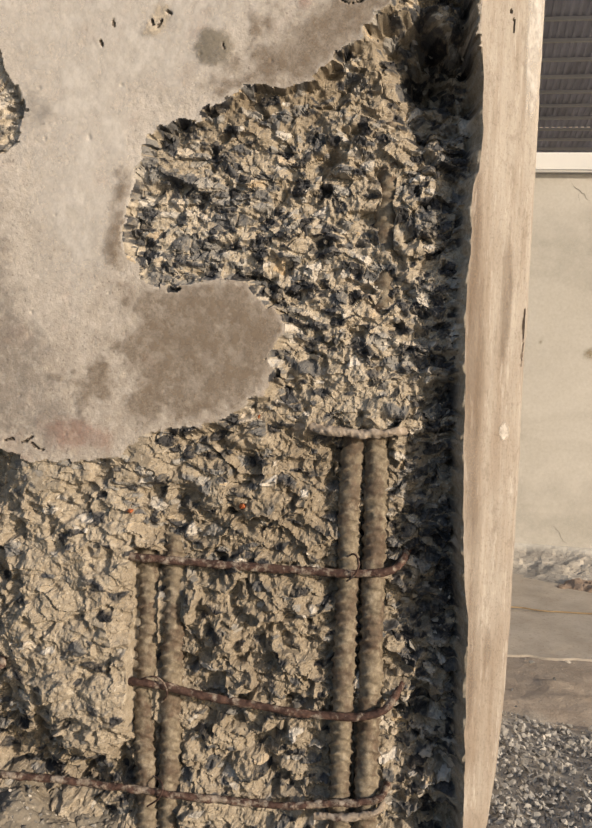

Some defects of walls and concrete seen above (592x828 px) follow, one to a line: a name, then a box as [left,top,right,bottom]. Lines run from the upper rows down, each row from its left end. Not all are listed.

spalling [0,49,30,153]
leakage [0,0,239,268]
leakage [81,362,108,399]
leakage [116,286,280,417]
spalling [0,591,8,634]
spalling [0,540,11,590]
spalling [0,636,138,785]
spalling [42,782,139,828]
spalling [151,564,167,828]
spalling [173,695,332,828]
spalling [179,565,339,712]
spalling [349,439,367,812]